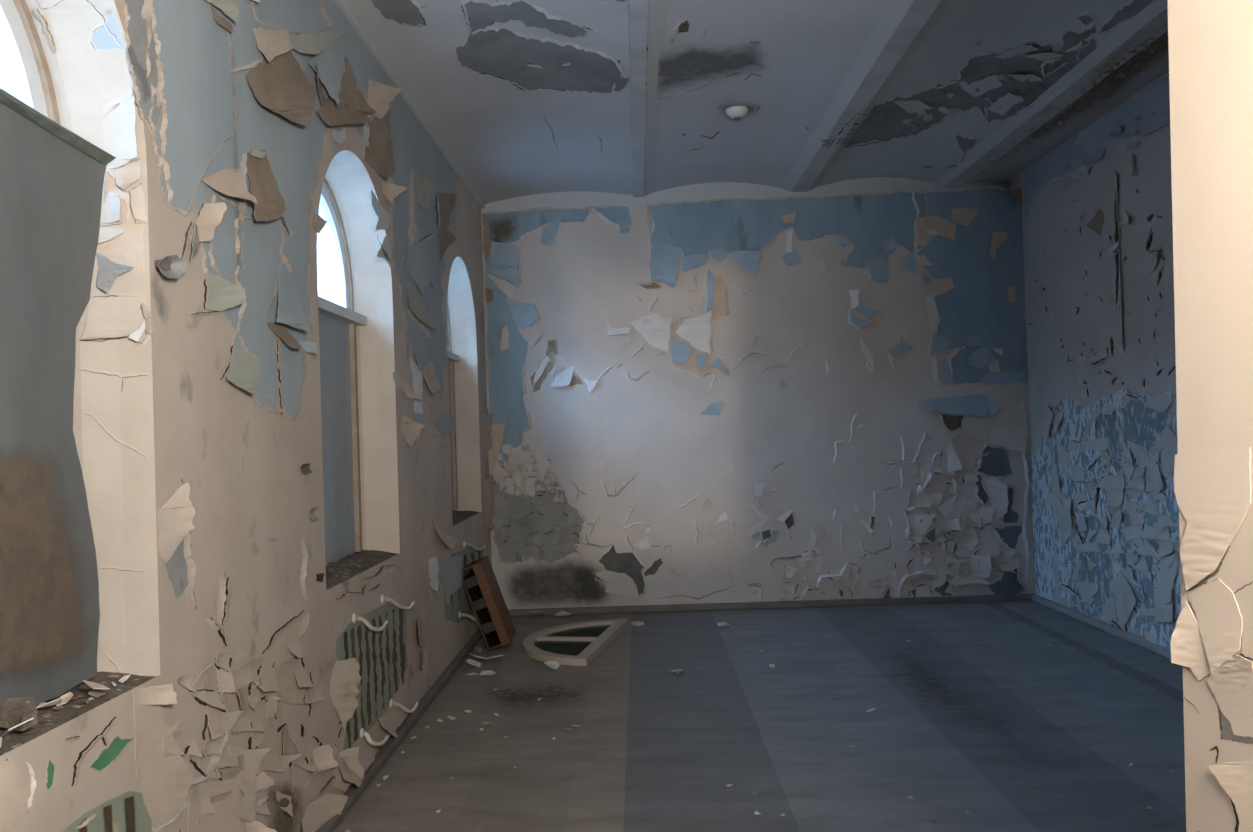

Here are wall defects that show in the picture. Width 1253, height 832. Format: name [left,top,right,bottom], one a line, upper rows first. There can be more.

peeling [454,0,631,95]
peeling [672,17,691,42]
peeling [804,0,1154,171]
peeling [80,0,460,447]
peeling [424,516,463,614]
water stain [513,567,605,601]